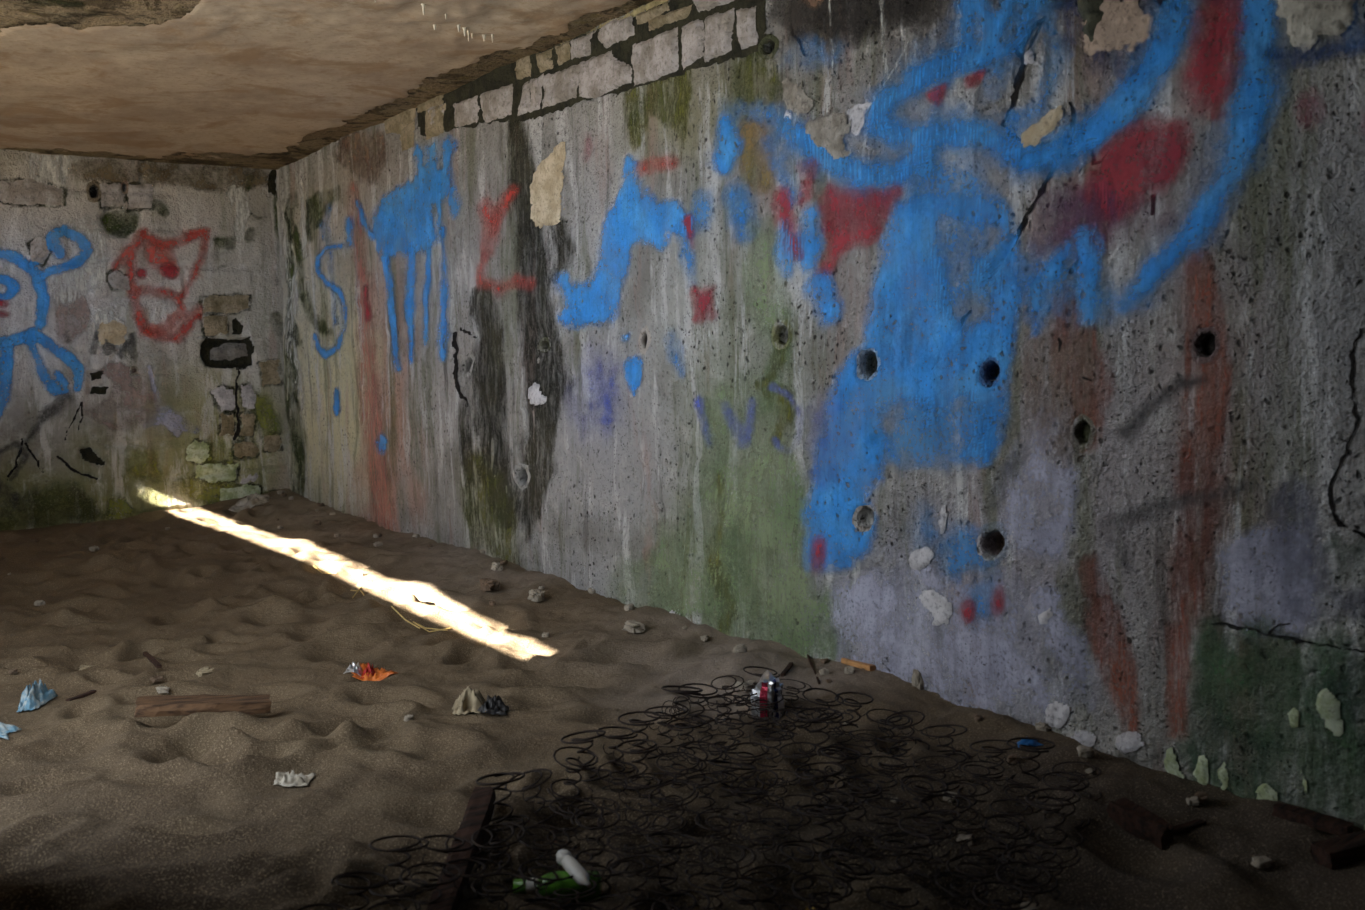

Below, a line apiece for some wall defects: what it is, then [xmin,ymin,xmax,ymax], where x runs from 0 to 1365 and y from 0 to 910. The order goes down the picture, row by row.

peeling [0,0,767,160]
spalling [1082,0,1154,56]
spalling [267,170,277,196]
water stain [458,120,575,546]
crack [1327,328,1365,539]